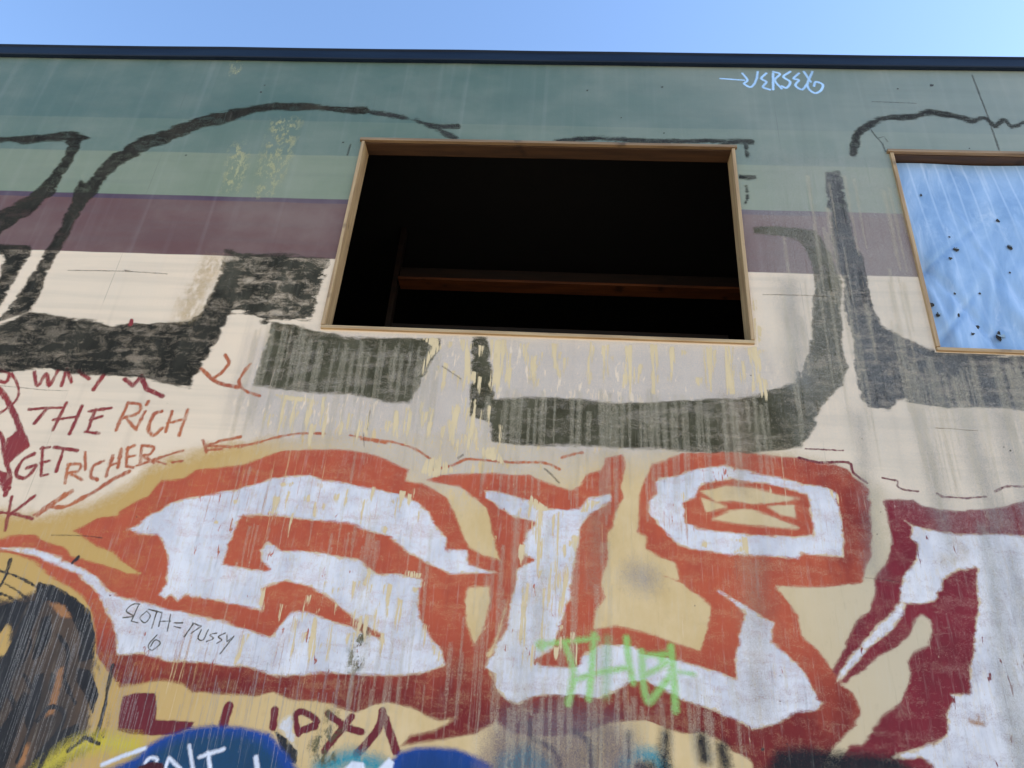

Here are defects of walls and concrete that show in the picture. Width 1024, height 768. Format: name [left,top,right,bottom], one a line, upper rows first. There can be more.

peeling [261,394,369,447]
peeling [384,337,569,477]
peeling [586,342,688,394]
peeling [695,301,769,400]